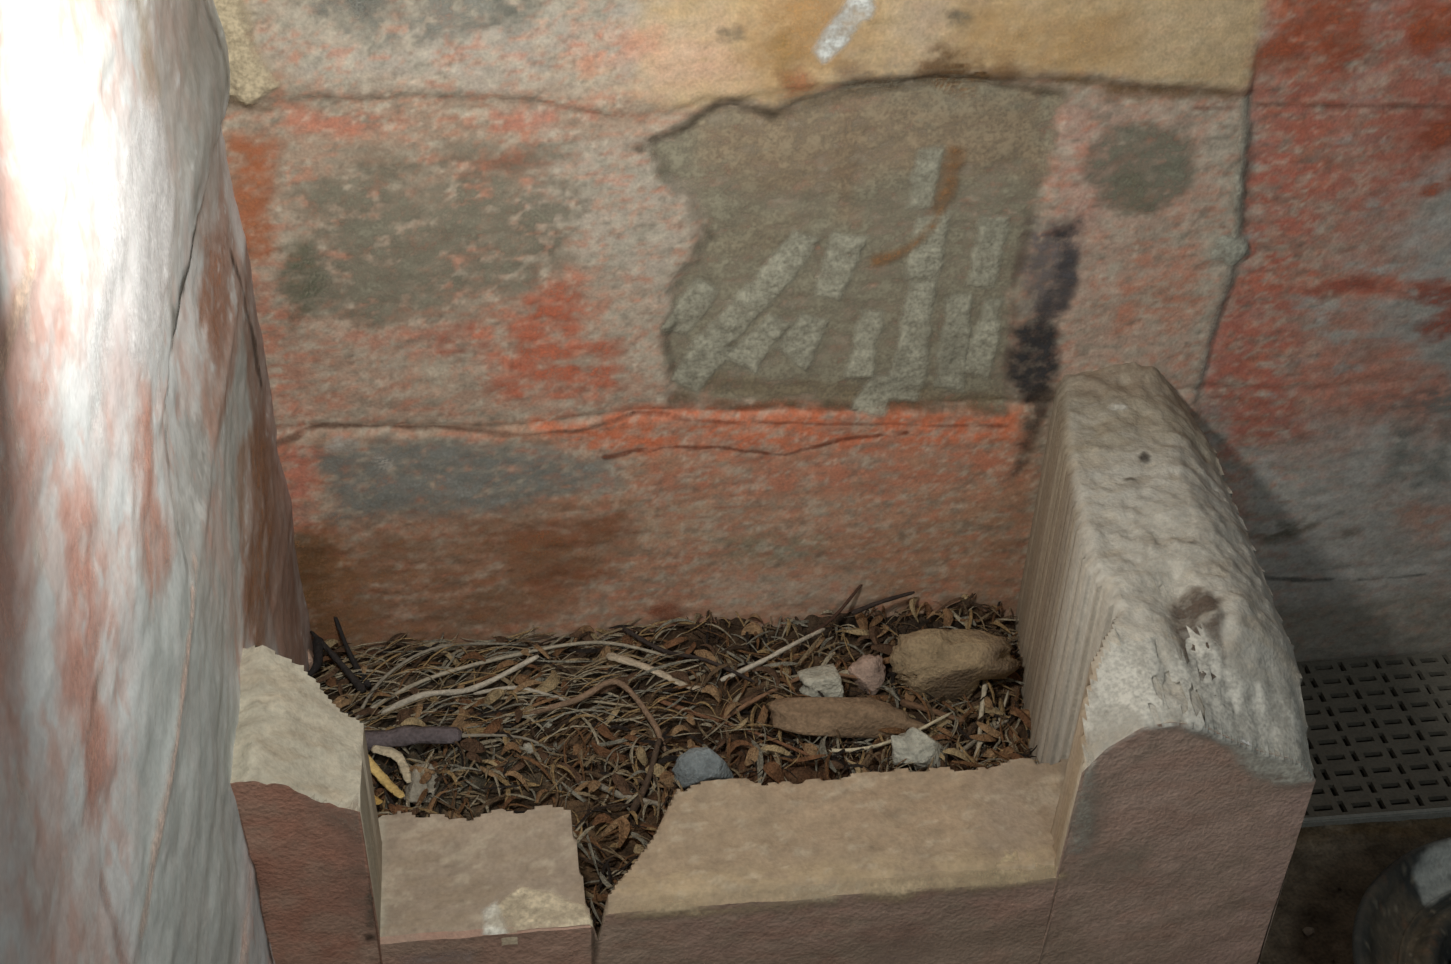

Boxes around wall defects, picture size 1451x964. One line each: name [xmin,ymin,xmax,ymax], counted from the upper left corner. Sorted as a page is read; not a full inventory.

crack [173,231,195,335]
crack [232,253,262,386]
flaking render [635,74,1064,414]
crack [276,423,360,444]
crack [398,425,495,433]
crack [552,412,908,459]